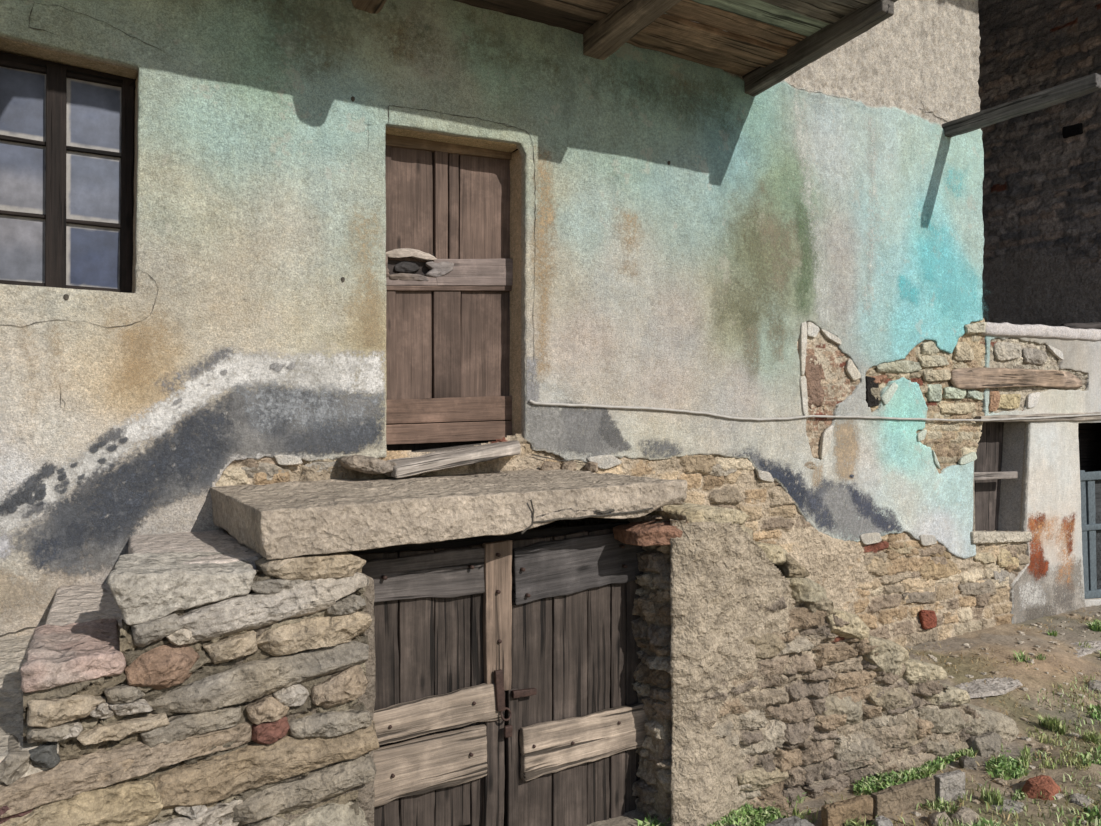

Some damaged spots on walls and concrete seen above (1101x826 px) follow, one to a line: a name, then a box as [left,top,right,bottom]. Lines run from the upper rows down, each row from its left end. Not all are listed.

leakage [720,103,829,373]
crack [99,269,158,328]
leakage [123,327,229,392]
flaking render [797,318,1088,474]
peeling [0,350,392,558]
flaking render [378,449,432,461]
leakage [835,420,858,480]
flaking render [417,433,1086,647]
corrosion [1028,514,1075,583]